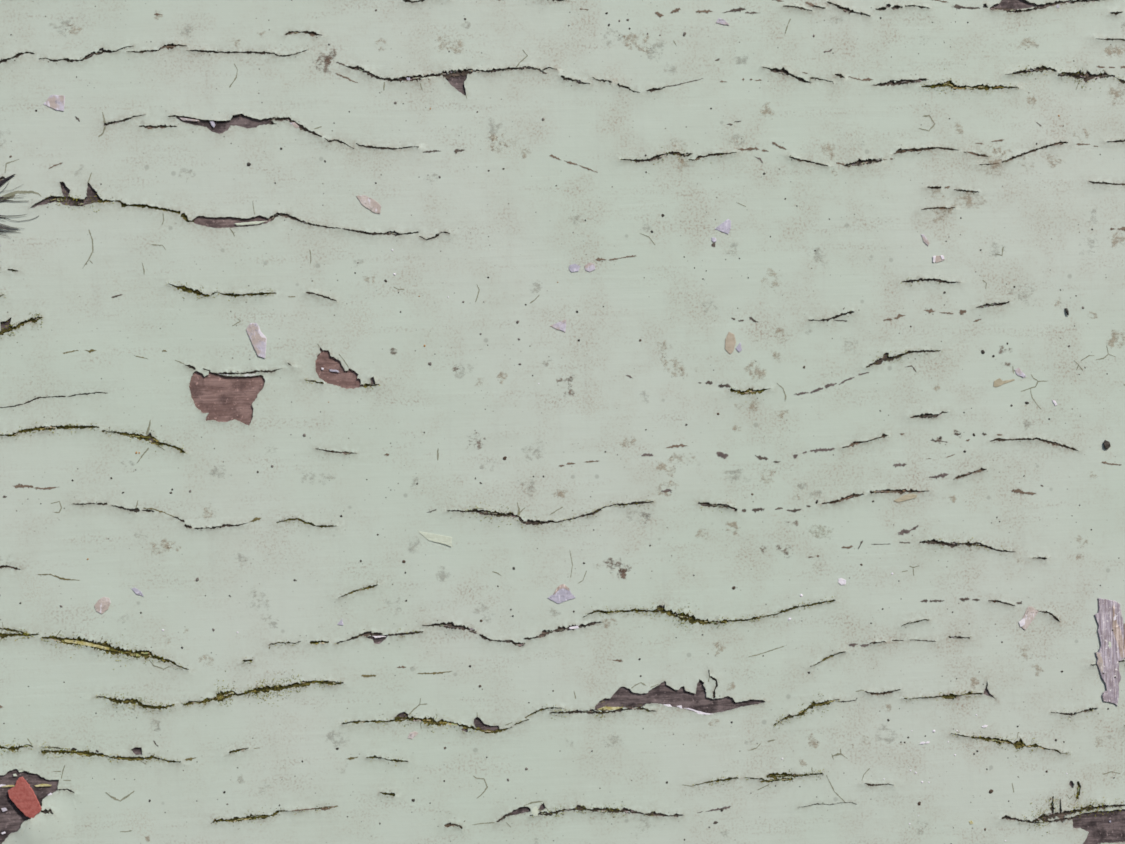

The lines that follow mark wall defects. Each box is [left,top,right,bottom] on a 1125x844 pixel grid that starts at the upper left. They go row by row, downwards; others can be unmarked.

peeling [954,0,1100,13]
crack [550,12,1125,210]
peeling [175,323,292,425]
peeling [306,345,380,389]
crack [0,392,186,463]
crack [698,411,1122,513]
crack [422,553,835,647]
crack [0,622,189,670]
crack [0,639,576,764]
peeling [550,670,765,720]
peeling [0,765,74,844]
peeling [1001,781,1125,844]